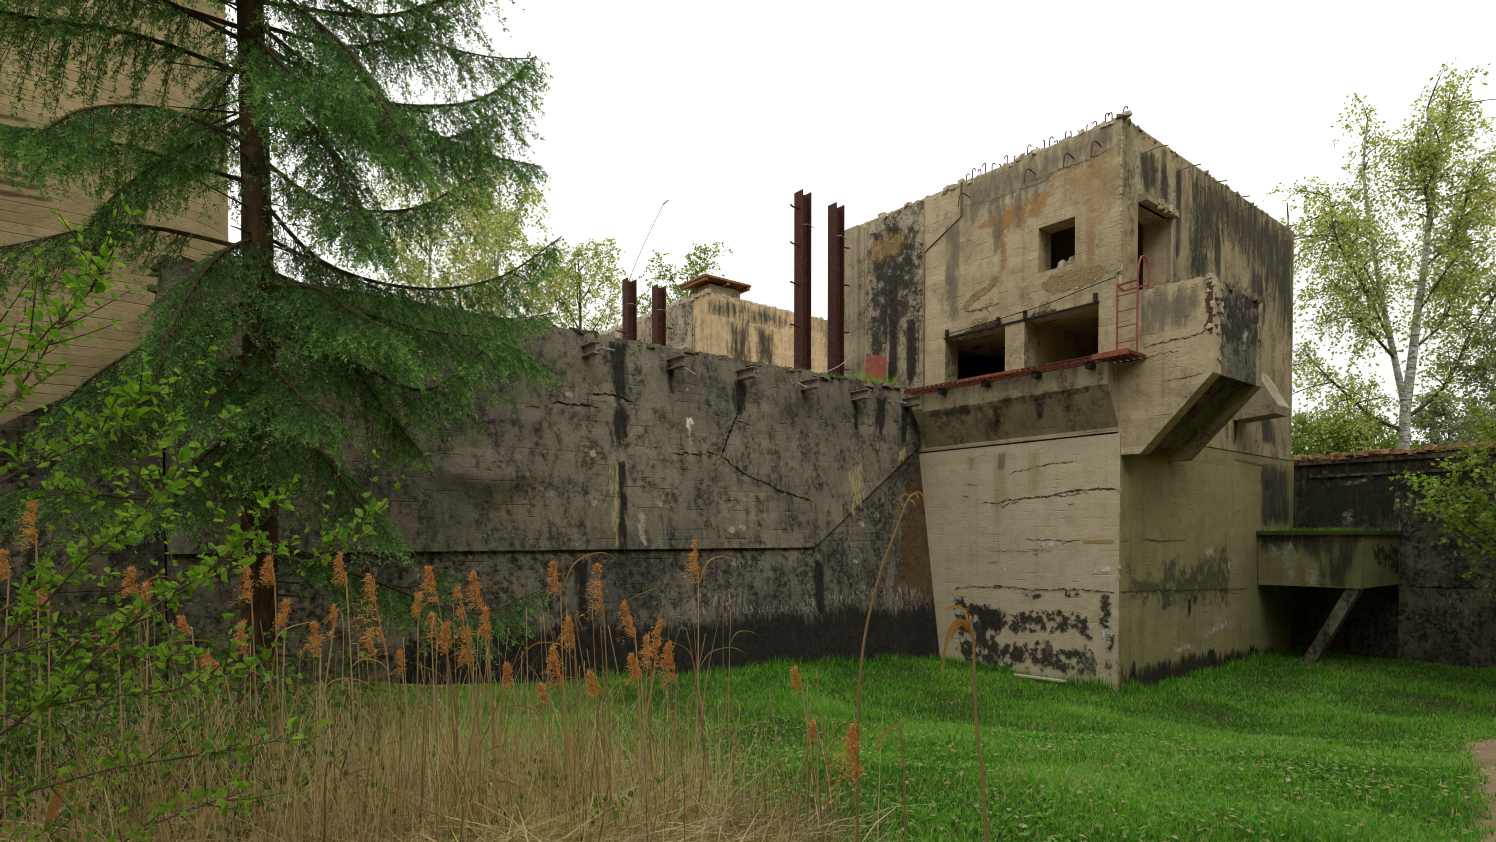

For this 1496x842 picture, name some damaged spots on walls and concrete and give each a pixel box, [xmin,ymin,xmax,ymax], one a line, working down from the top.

damp [866,220,923,465]
damp [940,224,959,314]
rust [981,193,1048,268]
damp [971,128,1112,248]
peeling [860,106,1307,316]
spalling [1204,280,1215,334]
crack [675,412,813,502]
damp [390,548,1277,688]